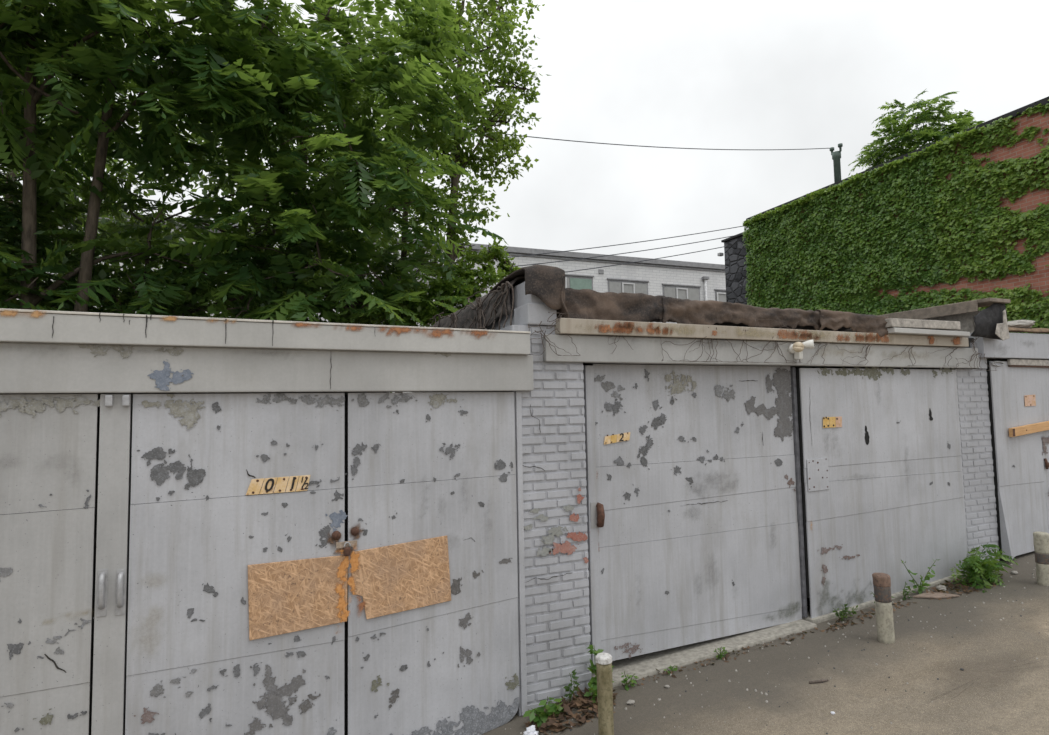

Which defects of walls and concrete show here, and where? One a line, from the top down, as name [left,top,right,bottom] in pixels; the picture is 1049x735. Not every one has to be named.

rust [380,327,452,337]
rust [595,322,673,335]
peeling [138,347,221,432]
peeling [607,370,697,481]
peeling [714,366,793,441]
peeling [137,447,209,501]
peeling [524,487,589,564]
rust [328,525,365,622]
peeling [134,668,197,735]
peeling [199,635,321,735]
peeling [371,675,400,709]
peeling [411,673,520,735]